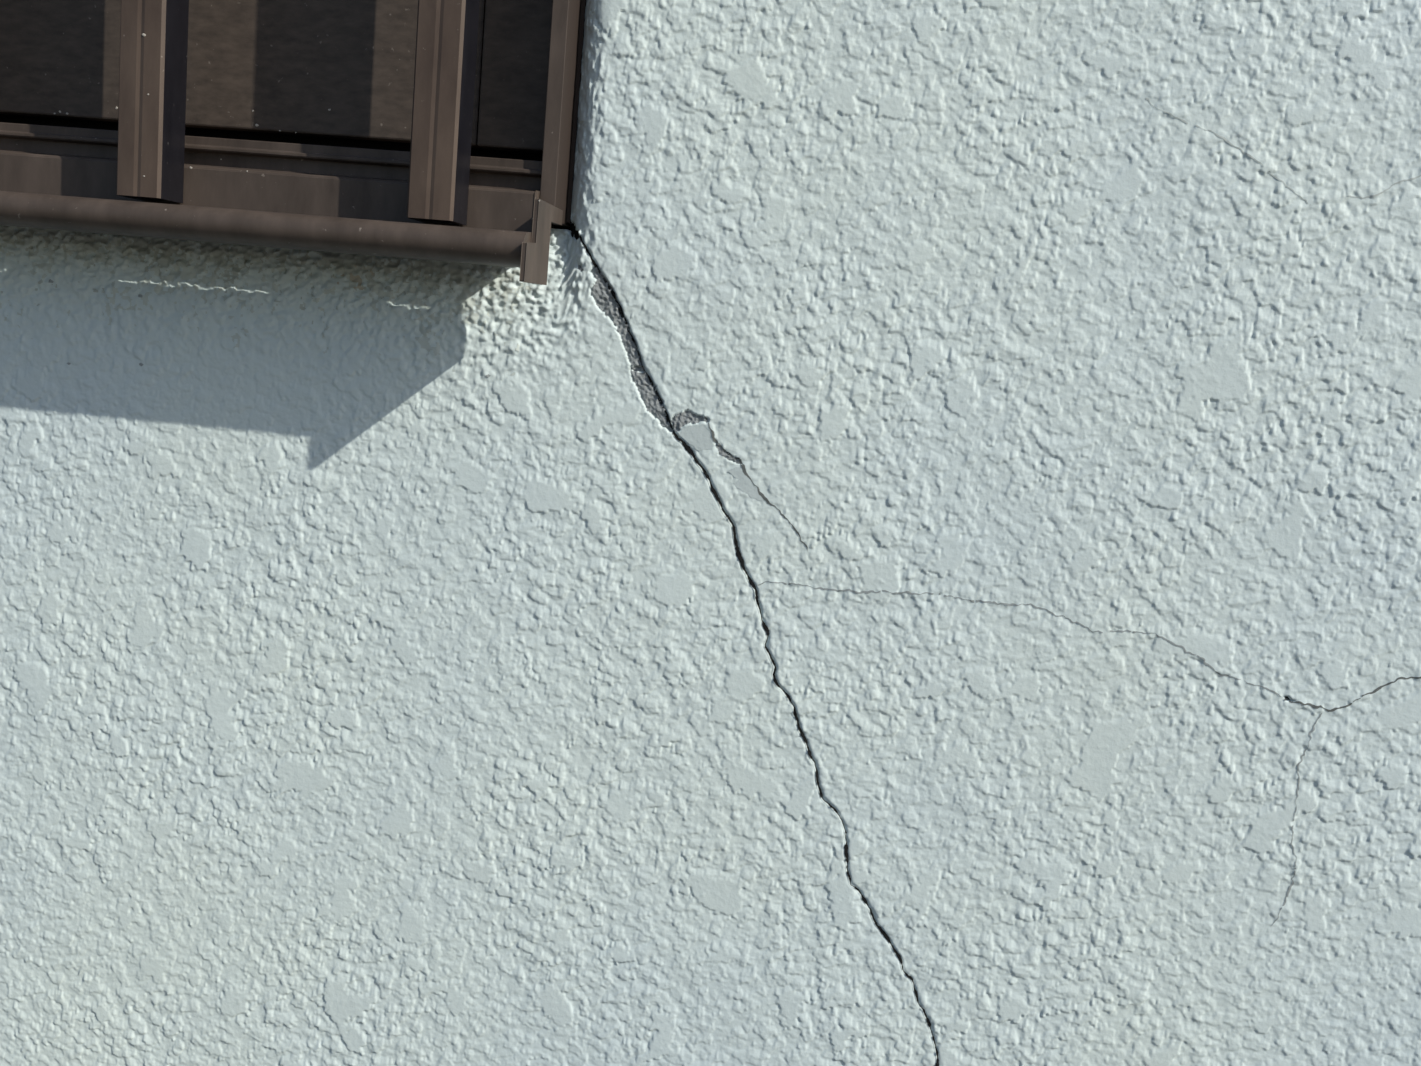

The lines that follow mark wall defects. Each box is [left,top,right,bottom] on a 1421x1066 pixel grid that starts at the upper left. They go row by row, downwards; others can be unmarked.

spalling [578,265,764,501]
crack [571,222,1421,1066]